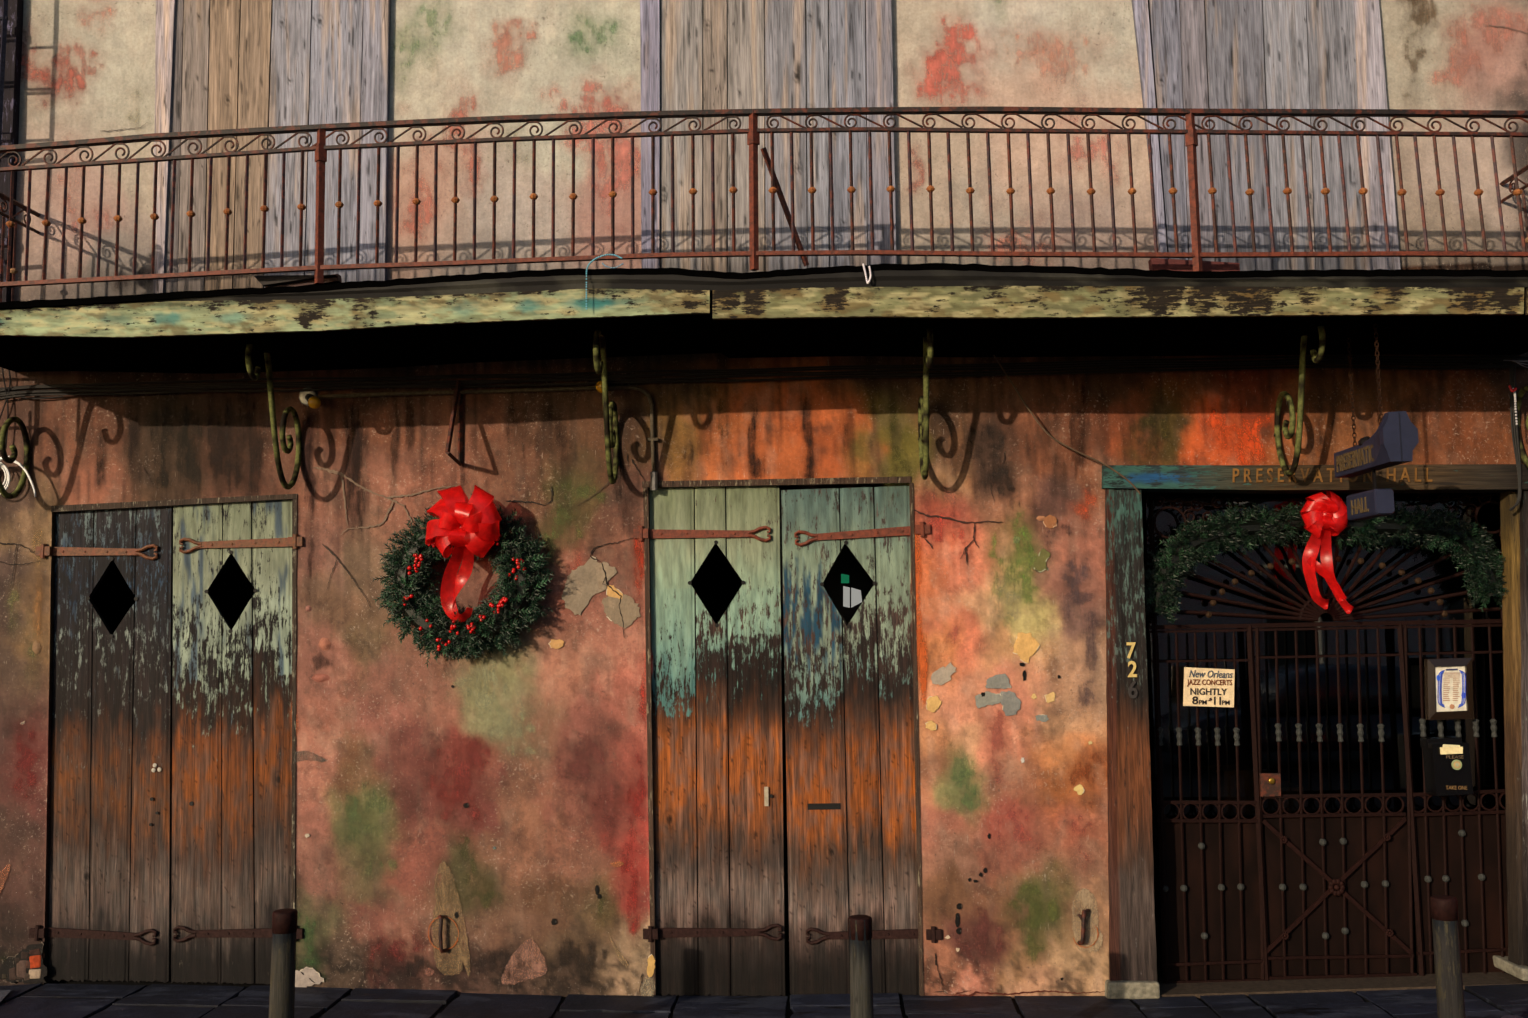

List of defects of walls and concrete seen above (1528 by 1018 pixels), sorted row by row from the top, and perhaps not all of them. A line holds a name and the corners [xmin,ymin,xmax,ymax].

damp [1411,0,1436,25]
damp [1405,8,1525,86]
damp [128,399,262,492]
damp [303,427,315,511]
damp [345,406,366,527]
damp [748,415,760,477]
damp [802,398,814,478]
crack [913,451,1006,565]
damp [1208,409,1271,465]
flaking render [606,585,623,599]
flaking render [925,679,951,731]
flaking render [1013,632,1056,715]